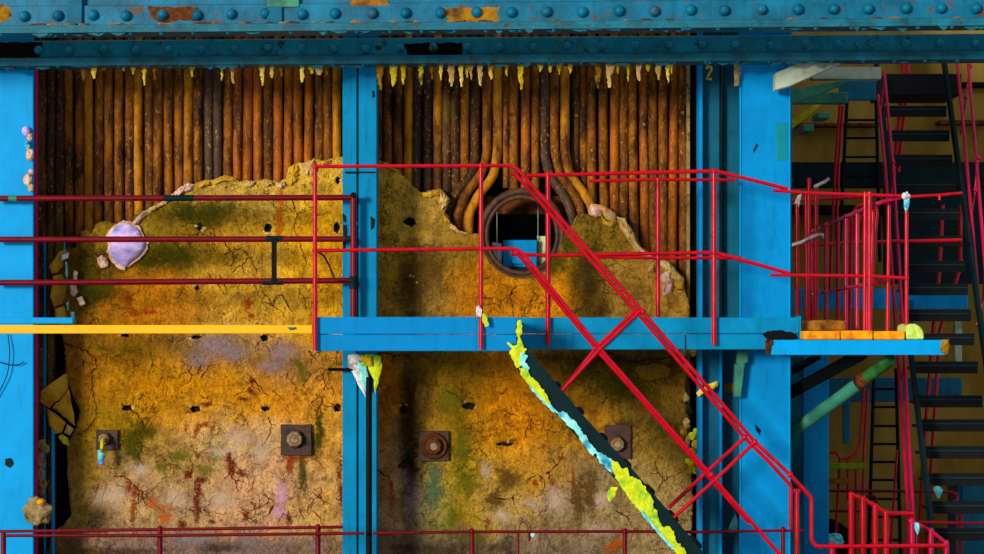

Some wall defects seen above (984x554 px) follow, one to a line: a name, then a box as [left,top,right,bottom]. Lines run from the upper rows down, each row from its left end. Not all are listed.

rust [148,6,199,23]
rust [444,7,500,22]
peeling [418,62,572,89]
peeling [589,62,673,89]
spalling [97,159,332,270]
spalling [588,204,684,296]
crack [50,343,97,434]
crack [601,353,672,404]
crack [91,350,342,522]
rust [282,456,309,473]
rust [122,470,216,528]
crack [495,452,637,536]